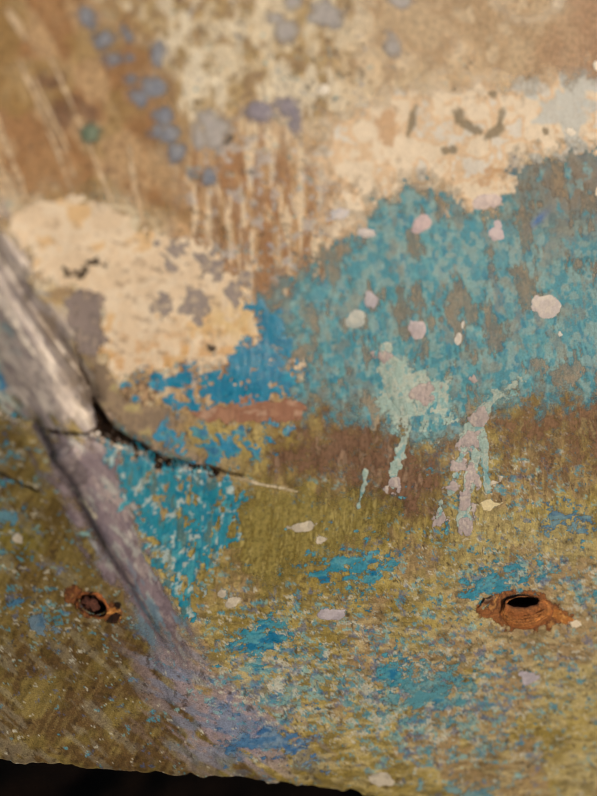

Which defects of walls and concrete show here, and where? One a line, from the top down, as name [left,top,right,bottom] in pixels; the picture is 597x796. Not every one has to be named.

peeling [9,67,597,627]
crack [40,335,297,492]
peeling [26,613,75,654]
corrosion [64,585,123,623]
peeling [208,593,329,674]
peeling [364,629,485,743]
peeling [491,631,545,688]
corrosion [476,589,574,632]
peeling [214,712,339,775]
peeling [368,772,502,796]